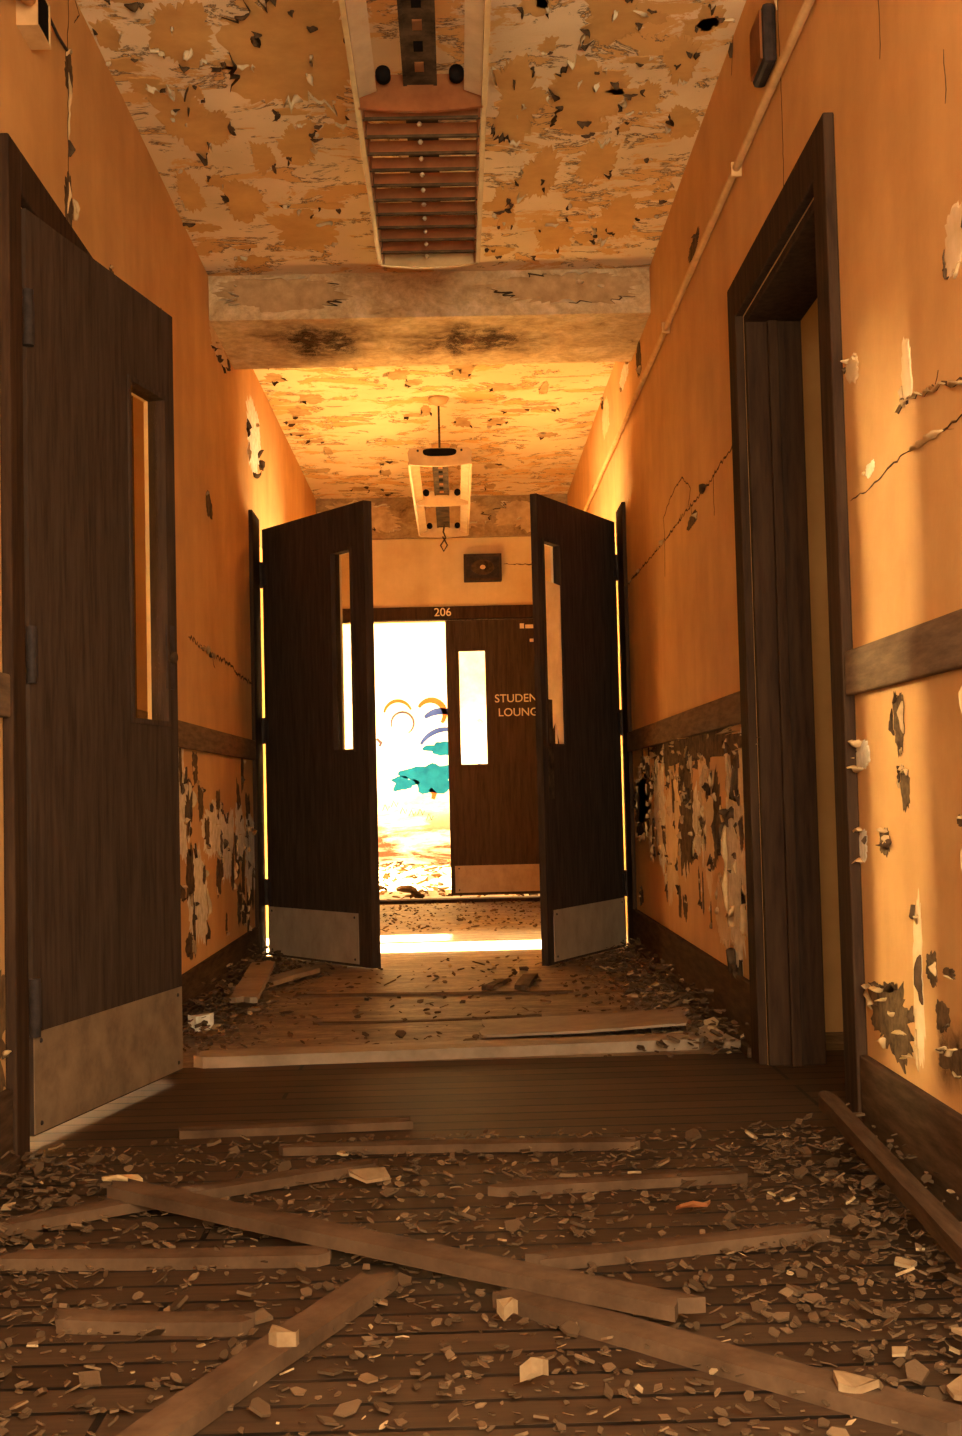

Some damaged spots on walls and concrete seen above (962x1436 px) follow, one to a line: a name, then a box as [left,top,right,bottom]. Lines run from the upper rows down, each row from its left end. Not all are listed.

peeling [64,171,80,226]
peeling [88,0,354,253]
peeling [482,0,736,304]
peeling [212,244,353,313]
crack [852,372,962,500]
crack [624,446,732,587]
peeling [846,739,871,773]
spalling [888,691,910,813]
spalling [178,747,257,960]
spalling [632,726,759,983]
peeling [851,827,892,864]
peeling [861,889,962,1079]